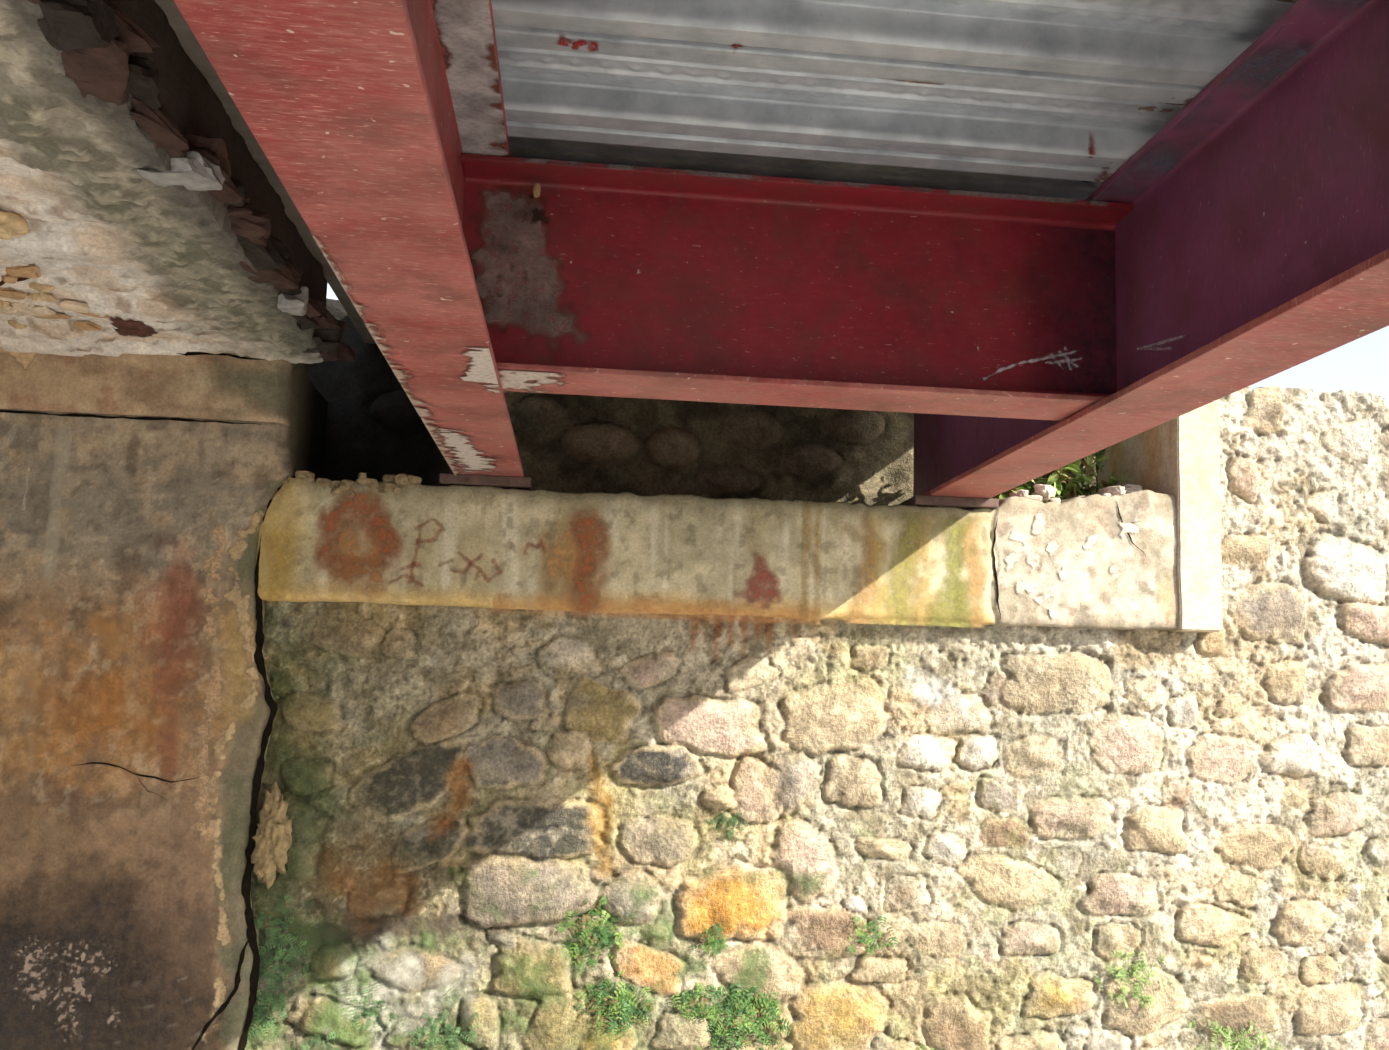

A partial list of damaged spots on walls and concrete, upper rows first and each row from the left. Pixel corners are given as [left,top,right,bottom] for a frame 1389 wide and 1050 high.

spalling [0,211,31,240]
peeling [0,265,157,337]
spalling [28,0,508,475]
peeling [469,188,589,349]
peeling [460,347,567,393]
rust [316,492,399,592]
rust [546,513,607,615]
crack [1116,502,1146,556]
peeling [192,512,265,947]
crack [70,762,198,798]
leakage [11,937,117,1042]
peeling [187,970,226,1050]